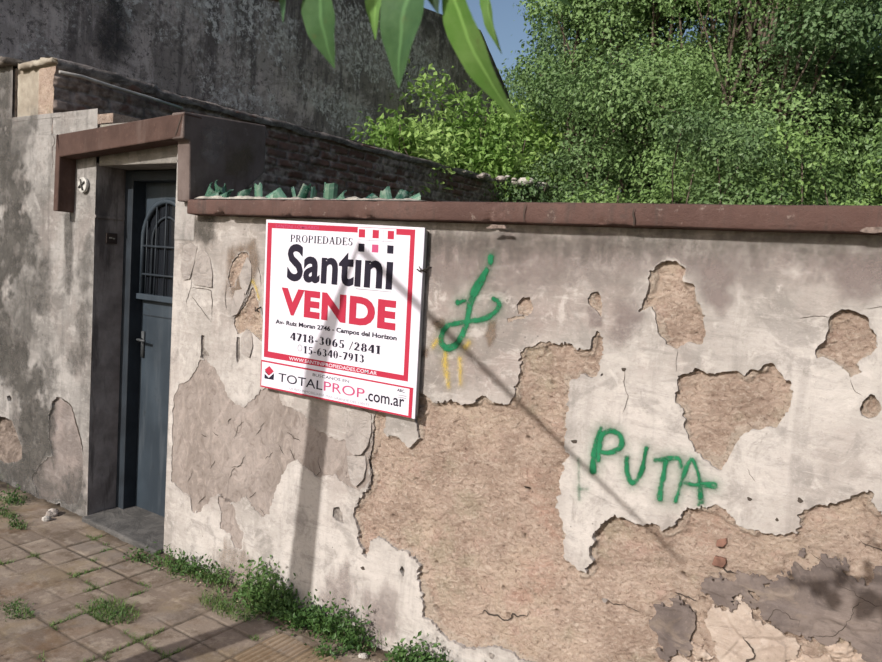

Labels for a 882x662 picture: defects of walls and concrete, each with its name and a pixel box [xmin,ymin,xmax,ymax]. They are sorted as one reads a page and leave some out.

damp [0,72,83,511]
damp [64,214,88,293]
spalling [228,252,263,357]
spalling [640,261,706,349]
spalling [816,309,878,377]
spalling [0,416,22,463]
spalling [171,332,882,662]